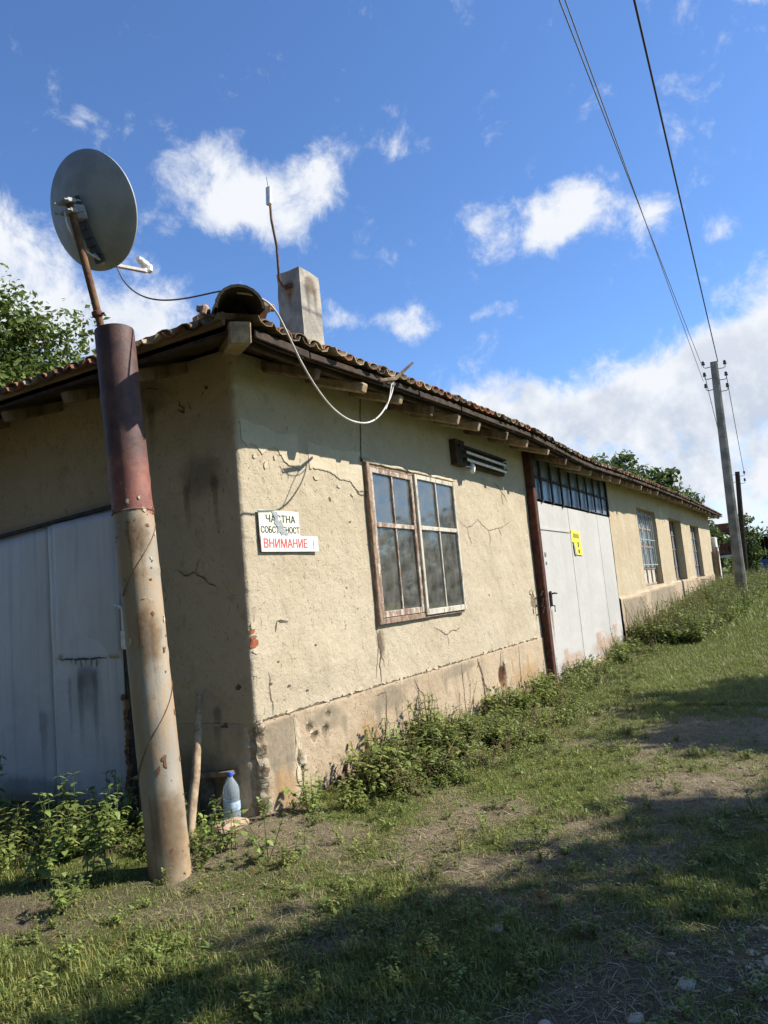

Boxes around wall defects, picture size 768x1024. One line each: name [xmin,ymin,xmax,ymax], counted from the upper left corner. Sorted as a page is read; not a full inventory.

crack [178,560,215,586]
flaking render [249,622,259,654]
spalling [248,720,273,816]
spalling [293,709,331,784]
crack [263,627,537,801]